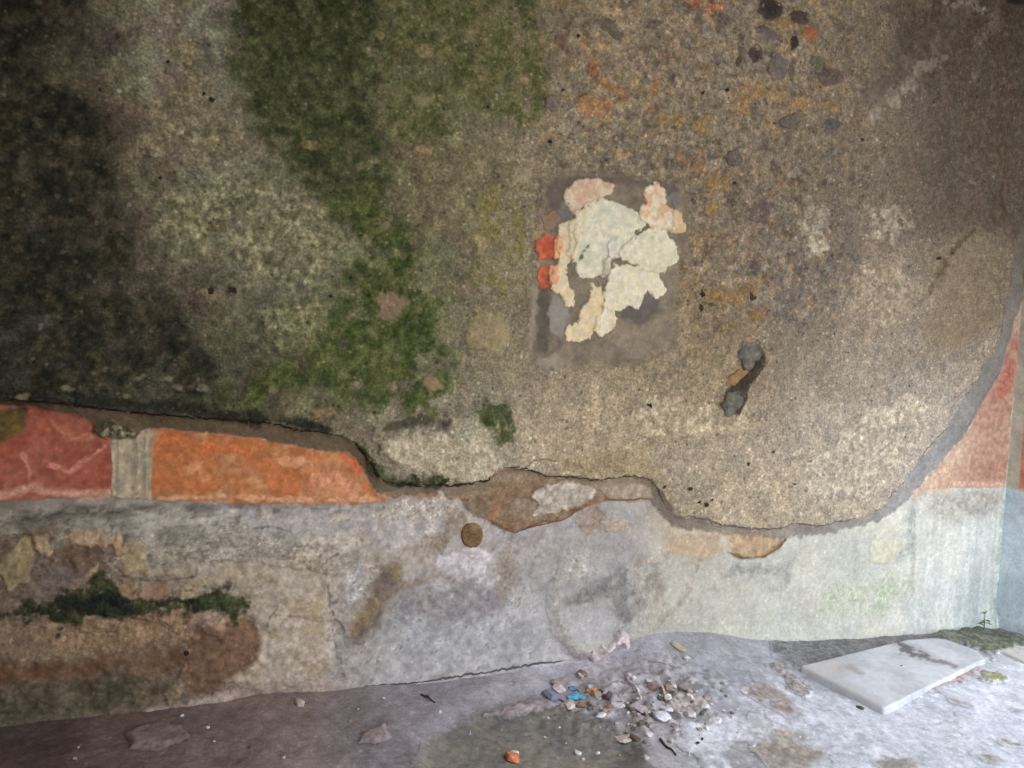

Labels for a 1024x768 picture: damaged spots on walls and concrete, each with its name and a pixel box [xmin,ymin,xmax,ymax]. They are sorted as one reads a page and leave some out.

leakage [0,0,355,502]
leakage [0,453,523,727]
crack [102,525,564,687]
crack [1,398,952,599]
flaking render [376,470,666,539]